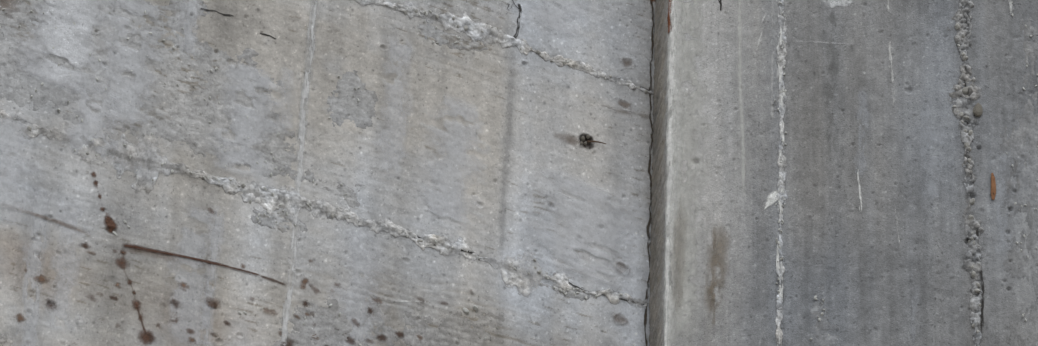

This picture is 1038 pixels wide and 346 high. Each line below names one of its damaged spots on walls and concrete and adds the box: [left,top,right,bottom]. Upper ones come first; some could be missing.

water stain [663,0,702,346]